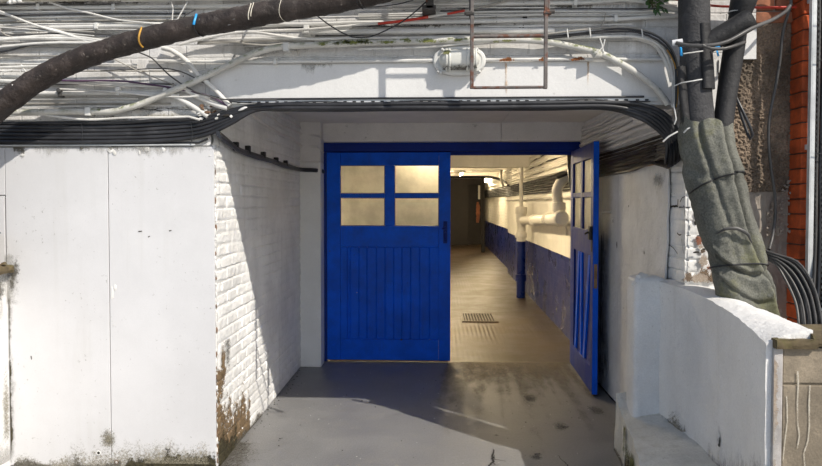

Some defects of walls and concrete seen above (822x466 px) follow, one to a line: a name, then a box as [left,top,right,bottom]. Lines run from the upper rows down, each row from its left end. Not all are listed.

peeling [749,180,791,256]
spalling [681,235,713,284]
peeling [767,261,788,319]
water stain [0,261,20,450]